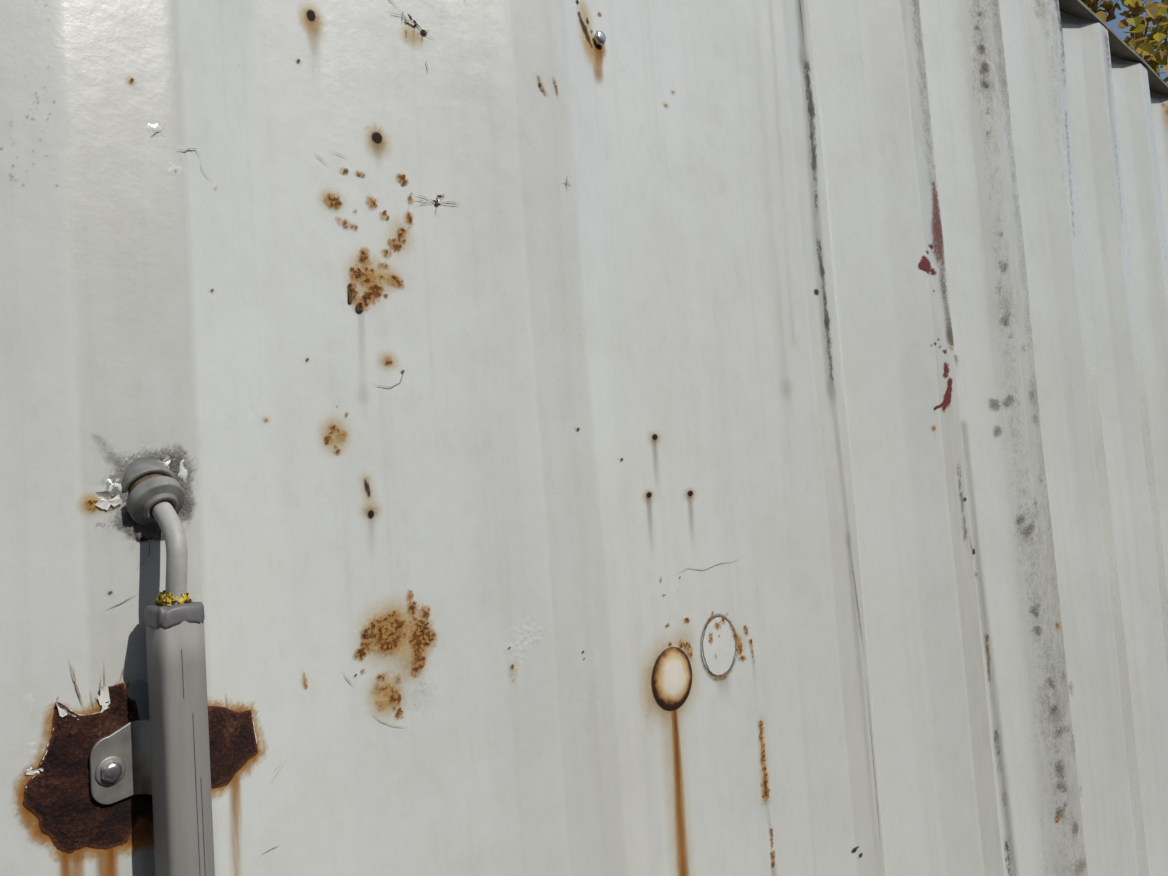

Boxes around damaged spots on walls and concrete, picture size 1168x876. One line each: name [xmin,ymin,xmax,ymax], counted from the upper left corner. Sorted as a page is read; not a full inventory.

corrosion [577,0,604,78]
corrosion [325,173,413,313]
peeling [918,181,957,413]
peeling [95,491,122,510]
corrosion [324,413,348,453]
corrosion [345,591,437,727]
corrosion [709,612,754,660]
corrosion [672,709,688,876]